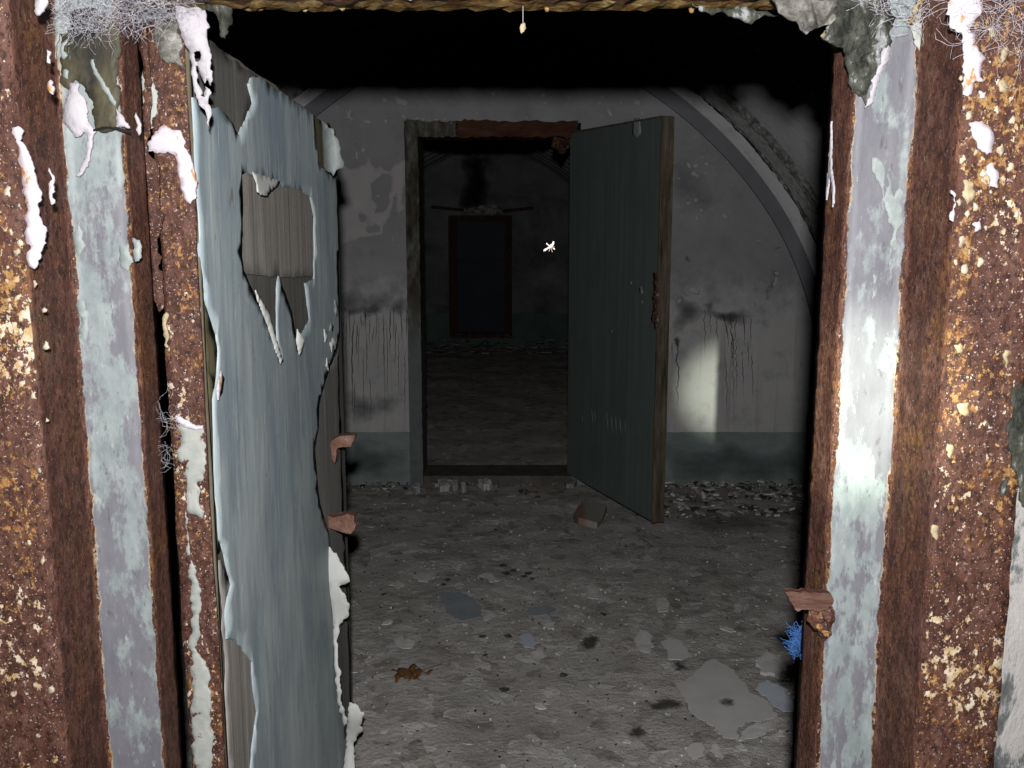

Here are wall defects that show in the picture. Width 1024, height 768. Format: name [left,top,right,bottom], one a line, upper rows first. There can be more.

corrosion [906,0,924,51]
peeling [34,0,198,204]
peeling [864,45,890,109]
peeling [3,126,56,303]
peeling [72,221,86,259]
peeling [119,238,142,272]
peeling [76,300,89,350]
peeling [216,371,225,400]
damp [682,306,753,402]
peeling [175,415,215,768]